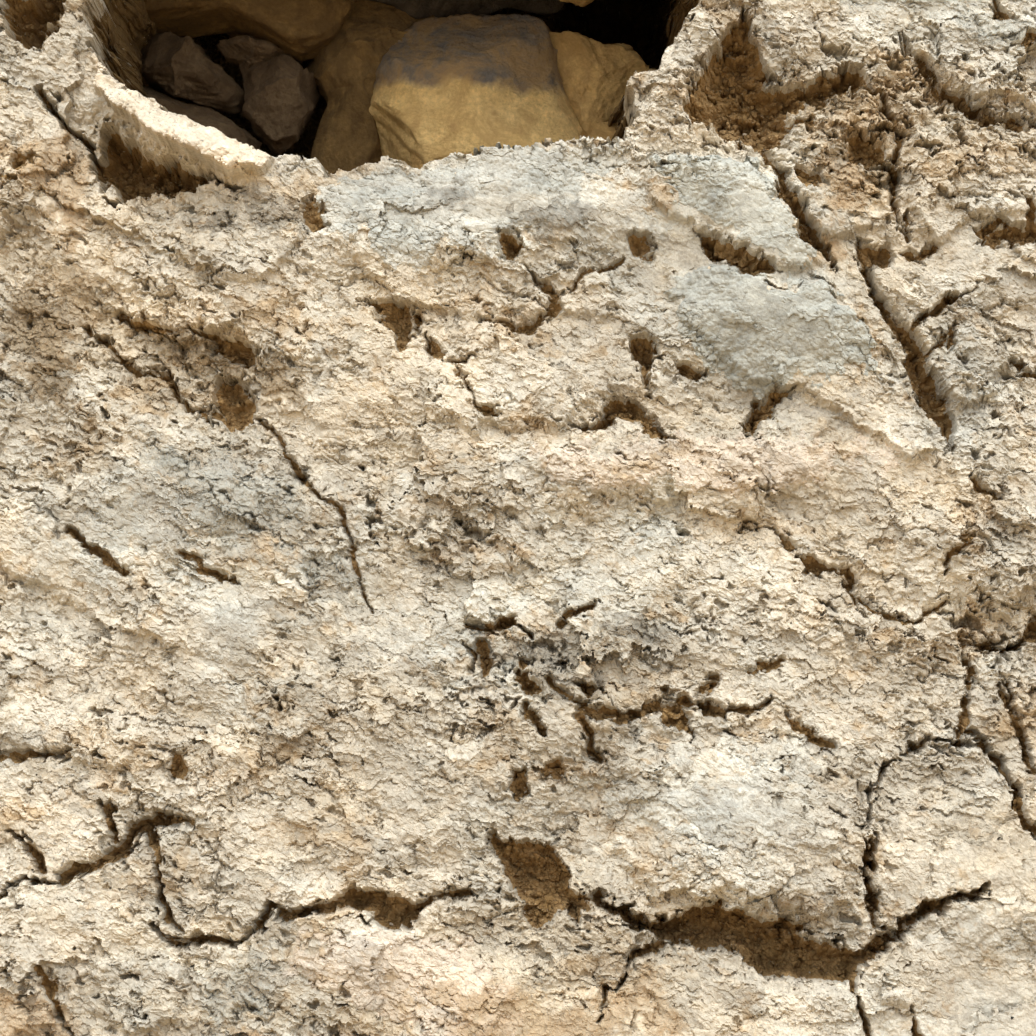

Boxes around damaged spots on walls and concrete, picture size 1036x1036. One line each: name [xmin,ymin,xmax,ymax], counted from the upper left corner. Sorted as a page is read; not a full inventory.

spalling [85,0,160,97]
spalling [179,34,244,89]
spalling [488,0,699,71]
spalling [175,91,327,160]
spalling [302,95,634,273]
spalling [628,234,653,262]
crack [756,150,834,268]
crack [856,241,975,451]
crack [547,675,771,738]
crack [0,803,478,947]